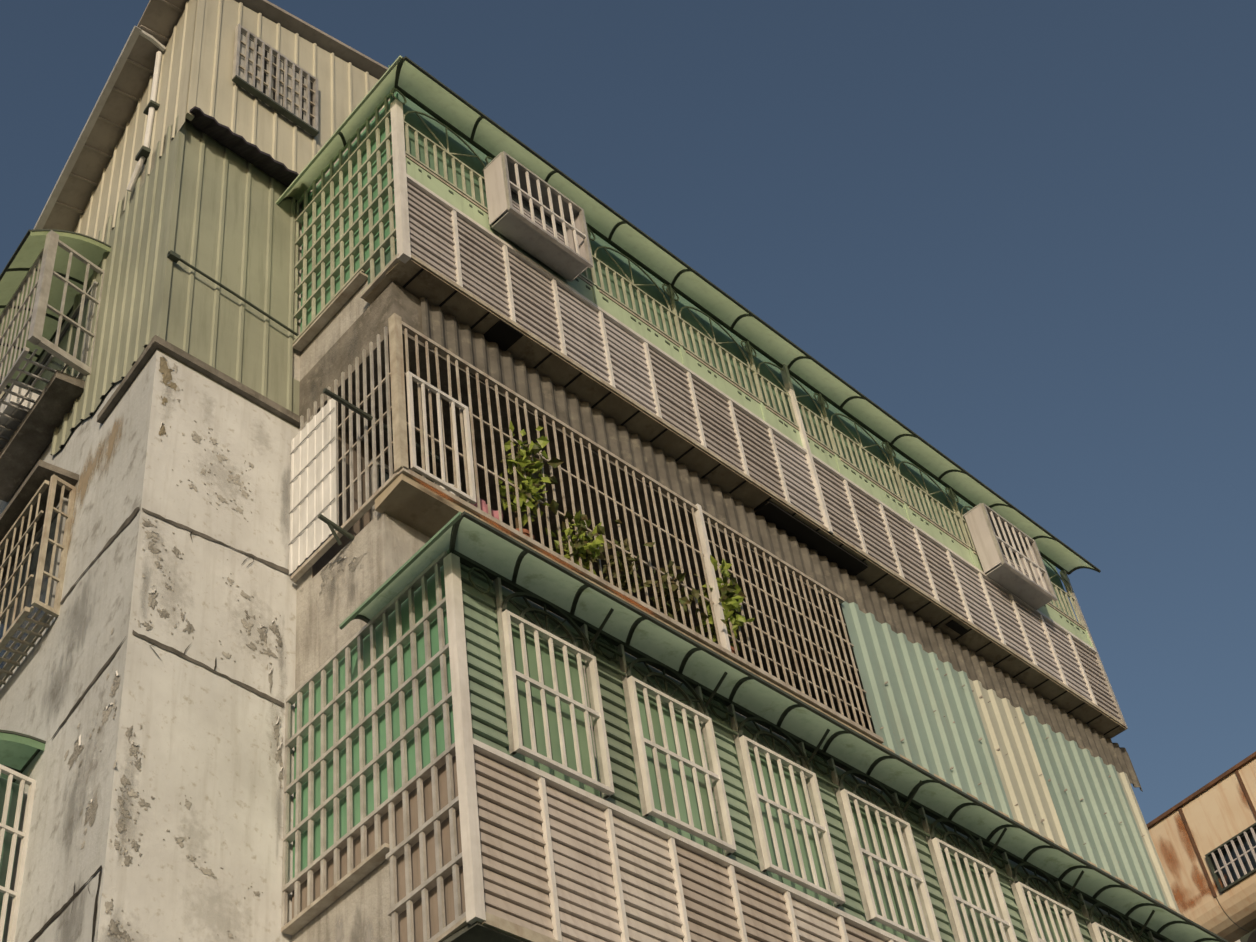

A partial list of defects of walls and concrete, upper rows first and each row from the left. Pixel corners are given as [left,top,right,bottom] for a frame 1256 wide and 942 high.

peeling [159,357,183,405]
peeling [159,420,254,522]
peeling [135,518,195,639]
peeling [64,671,120,770]
peeling [225,559,286,790]
peeling [80,791,98,850]
peeling [110,725,155,866]
rust [1173,818,1221,905]
peeling [105,899,139,942]